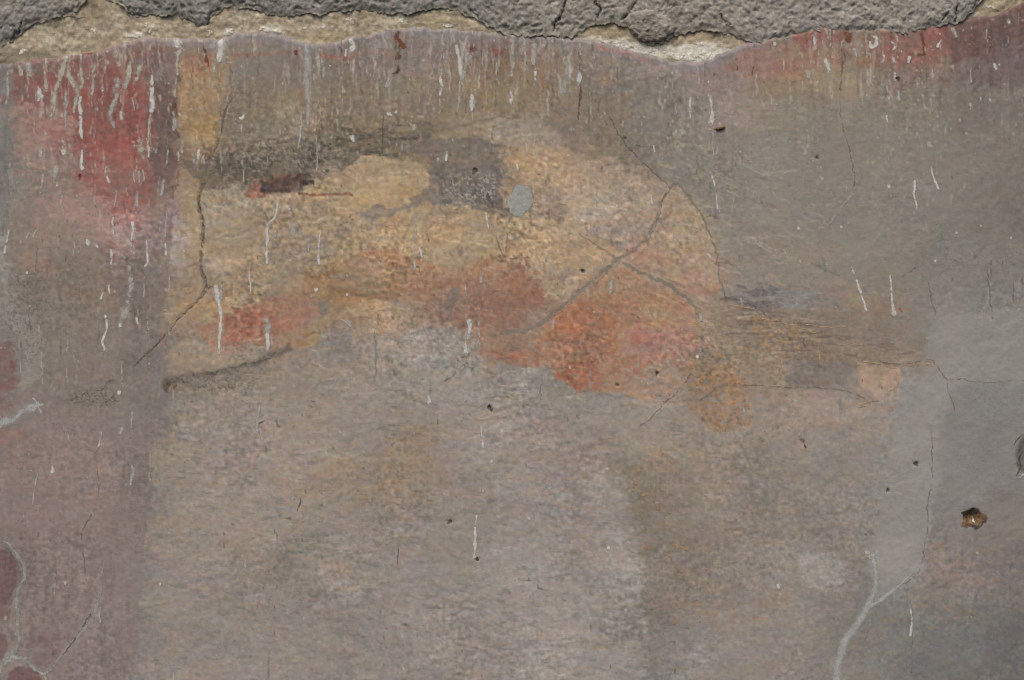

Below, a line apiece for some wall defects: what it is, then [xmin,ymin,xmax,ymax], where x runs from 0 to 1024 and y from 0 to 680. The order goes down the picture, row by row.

water stain [173,38,182,98]
spalling [0,0,502,64]
spalling [566,21,749,62]
spalling [966,0,1024,18]
water stain [5,50,205,351]
crack [136,99,232,364]
crack [501,116,777,335]
spalling [961,508,988,528]
crack [833,556,915,680]